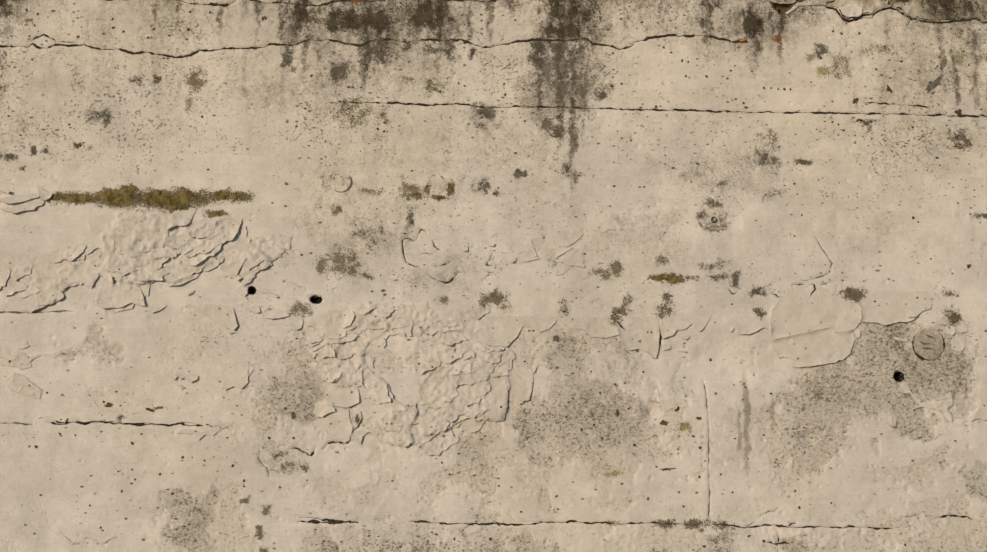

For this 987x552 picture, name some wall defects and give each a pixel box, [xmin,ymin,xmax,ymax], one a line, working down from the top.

crack [0,0,741,58]
damp [279,0,475,82]
damp [734,3,790,53]
crack [825,5,987,25]
damp [473,102,496,129]
damp [528,0,614,182]
crack [330,101,987,128]
peeling [0,185,53,214]
peeling [0,202,711,456]
peeling [727,284,932,368]
peeling [944,326,967,352]
crack [410,384,973,546]